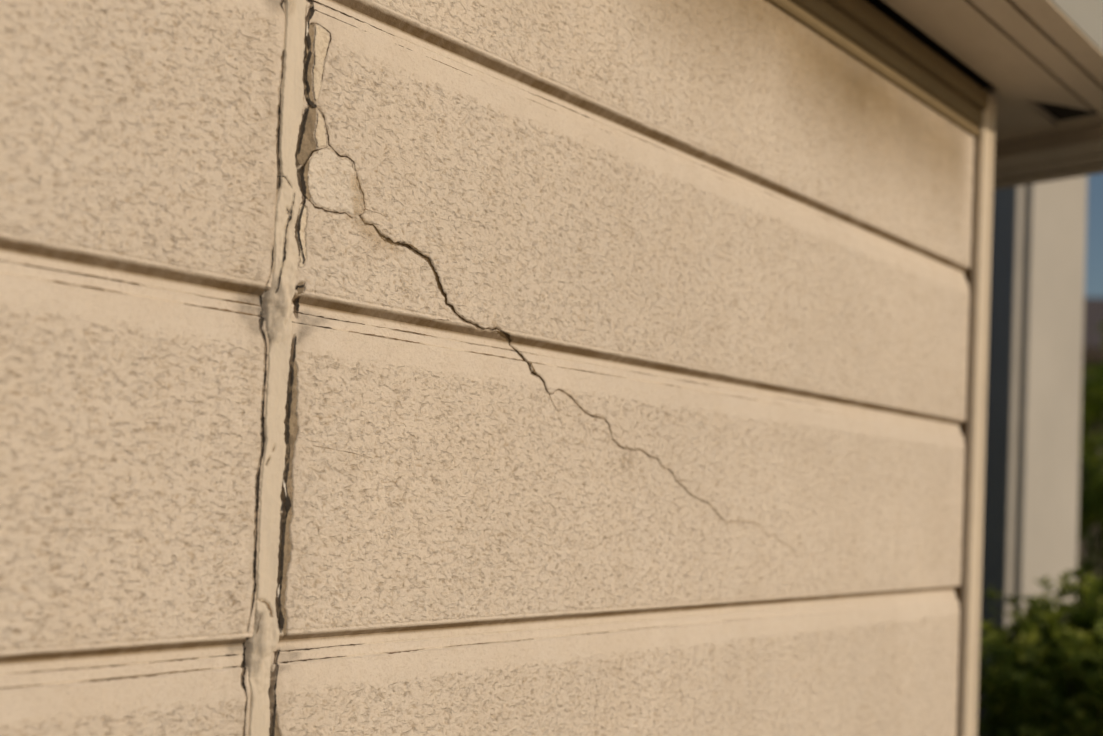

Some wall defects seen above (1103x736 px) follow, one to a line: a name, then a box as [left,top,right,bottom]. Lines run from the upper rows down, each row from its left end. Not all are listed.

crack [311,0,470,82]
crack [3,261,146,295]
crack [186,109,829,558]